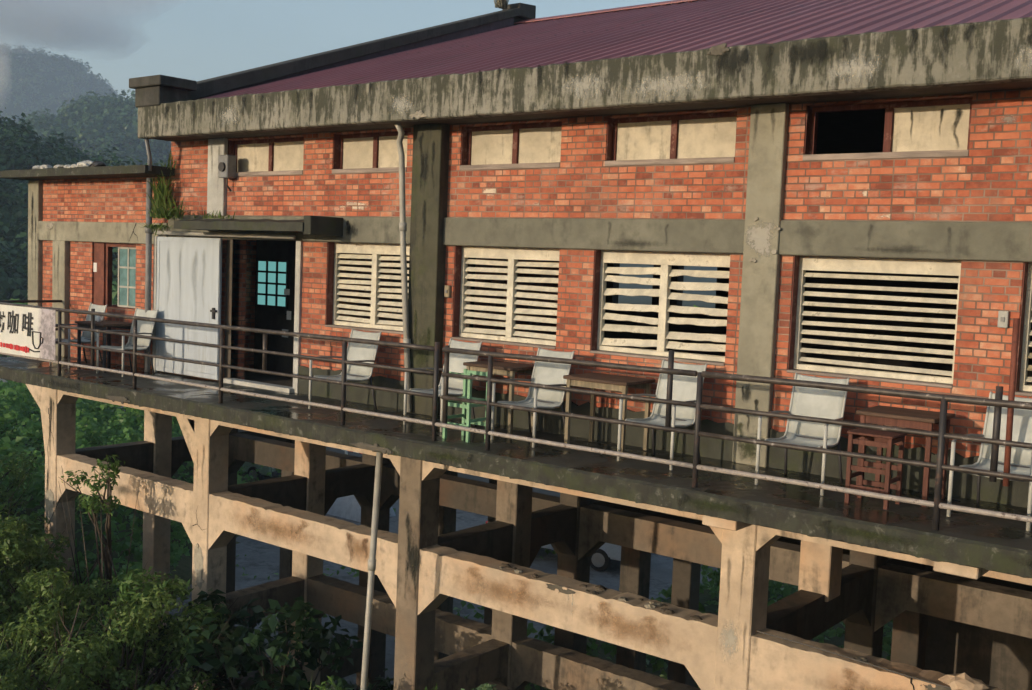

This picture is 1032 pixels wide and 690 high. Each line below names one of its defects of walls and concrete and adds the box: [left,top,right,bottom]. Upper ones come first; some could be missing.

damp [565,62,597,97]
damp [642,72,701,95]
damp [716,49,751,77]
damp [788,40,874,84]
peeling [746,217,781,263]